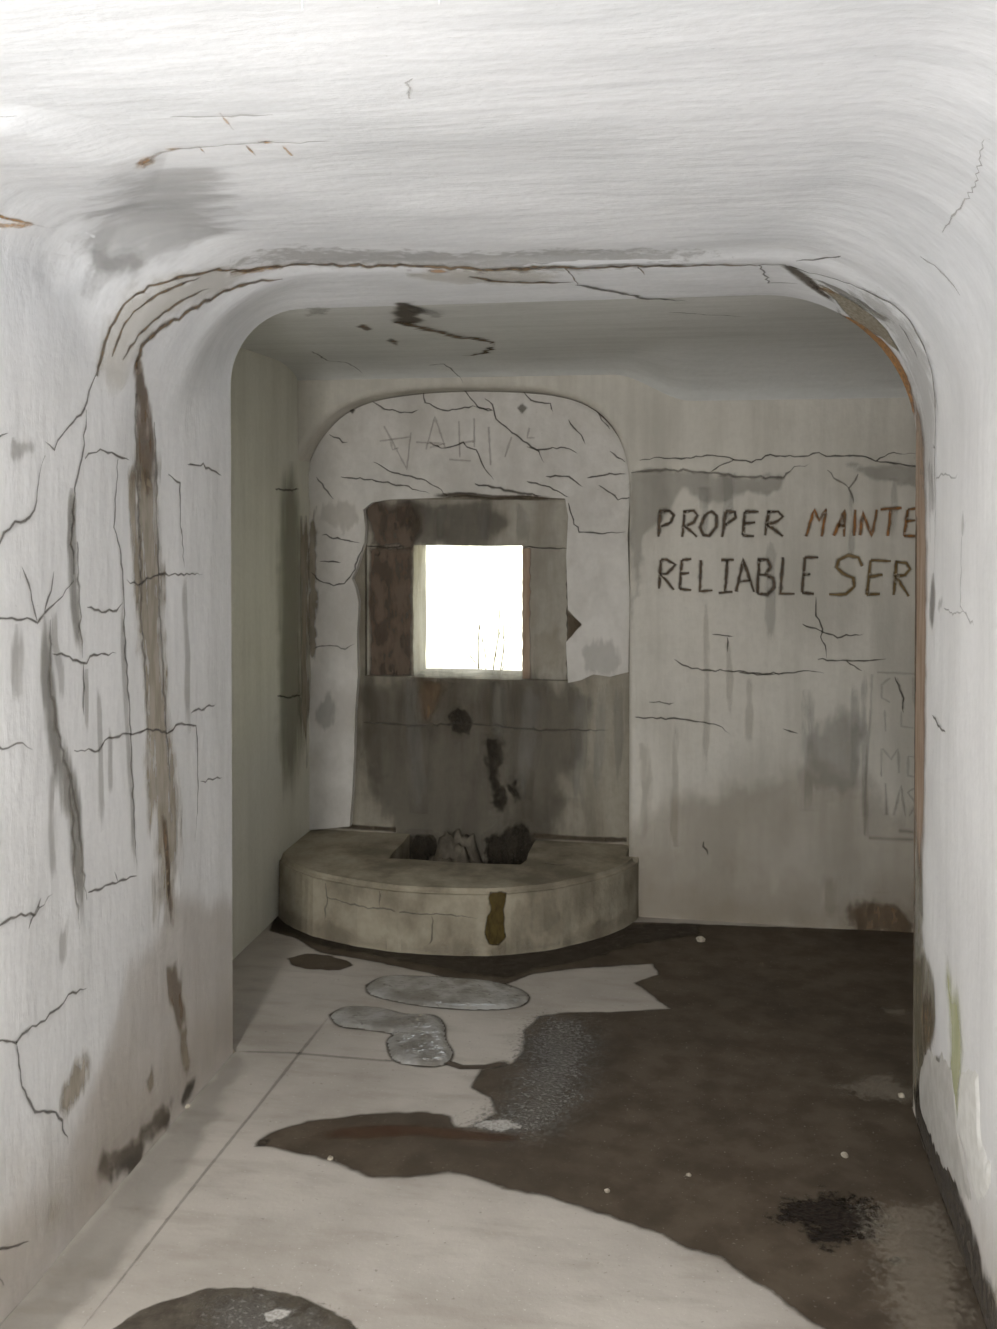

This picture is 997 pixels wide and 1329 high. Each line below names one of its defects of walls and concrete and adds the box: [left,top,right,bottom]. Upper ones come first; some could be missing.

spalling [785,266,915,413]
crack [0,256,945,893]
water stain [521,548,531,679]
water stain [485,685,520,810]
water stain [483,824,535,865]
crack [0,896,49,927]
corrosion [485,891,507,945]
crack [0,989,84,1137]
water stain [99,1107,170,1179]
water stain [167,967,195,1104]
water stain [257,903,997,1329]
water stain [114,1288,356,1329]